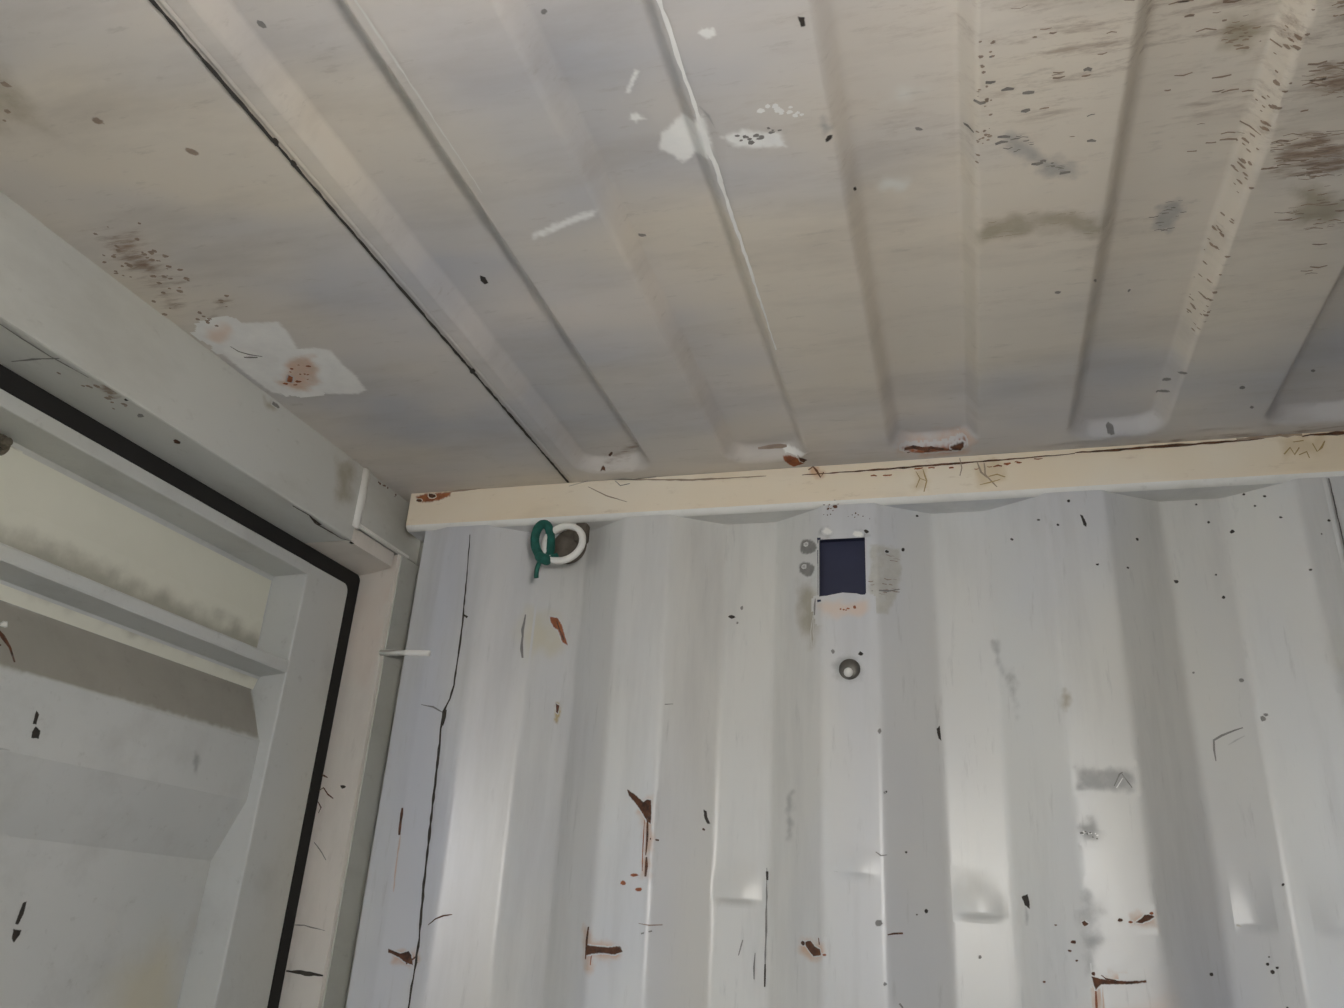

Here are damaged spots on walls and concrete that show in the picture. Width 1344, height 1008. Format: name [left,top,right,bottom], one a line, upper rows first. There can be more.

peeling [621,65,840,181]
peeling [190,316,371,400]
corrosion [803,402,1344,497]
corrosion [1117,903,1165,937]